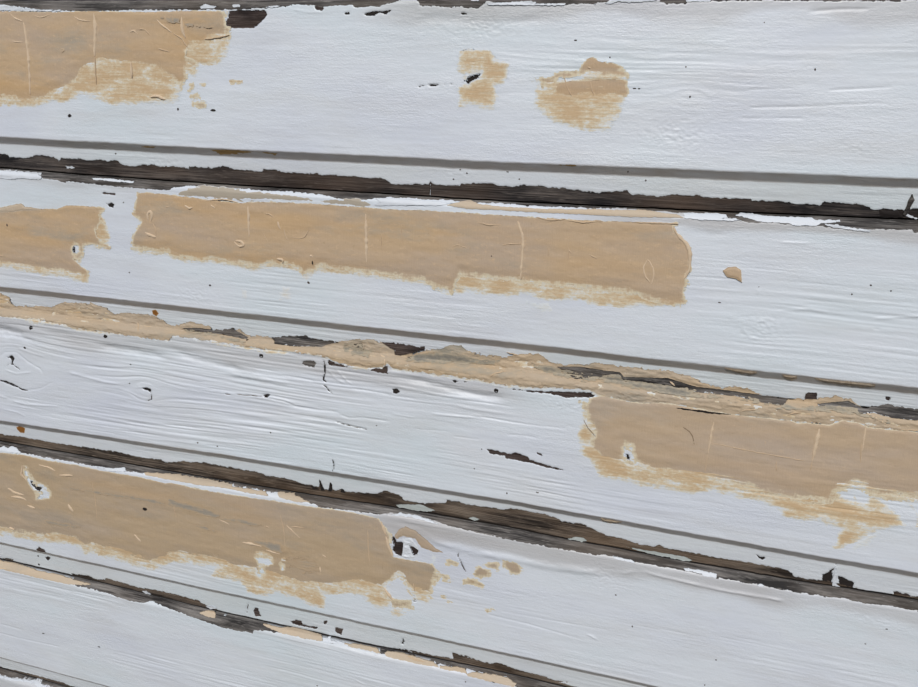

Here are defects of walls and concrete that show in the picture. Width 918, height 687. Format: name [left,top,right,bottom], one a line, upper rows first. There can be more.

peeling [0,0,399,28]
peeling [417,0,749,15]
peeling [0,153,918,233]
peeling [272,335,338,347]
peeling [382,342,425,359]
spalling [513,389,595,398]
peeling [558,366,788,405]
peeling [805,392,918,420]
peeling [0,434,918,612]
peeling [72,574,278,634]
peeling [0,667,74,687]
peeling [380,648,573,687]